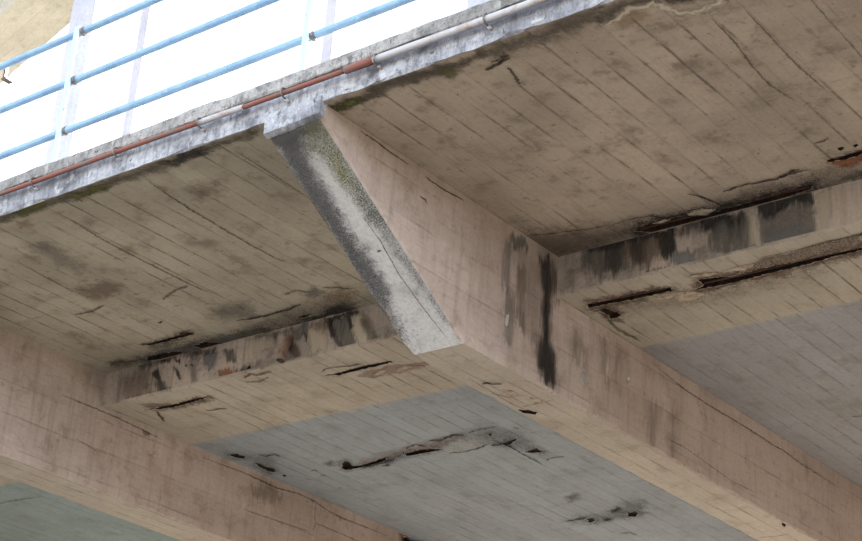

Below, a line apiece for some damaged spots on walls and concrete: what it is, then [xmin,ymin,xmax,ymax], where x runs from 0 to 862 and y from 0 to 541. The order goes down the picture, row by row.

leakage [271,121,385,305]
leakage [583,163,859,278]
spalling [630,183,818,236]
spalling [110,328,280,365]
leakage [127,292,377,391]
spalling [301,306,354,322]
leakage [538,254,559,389]
spalling [586,233,862,317]
spalling [339,427,544,471]
crack [662,371,839,488]